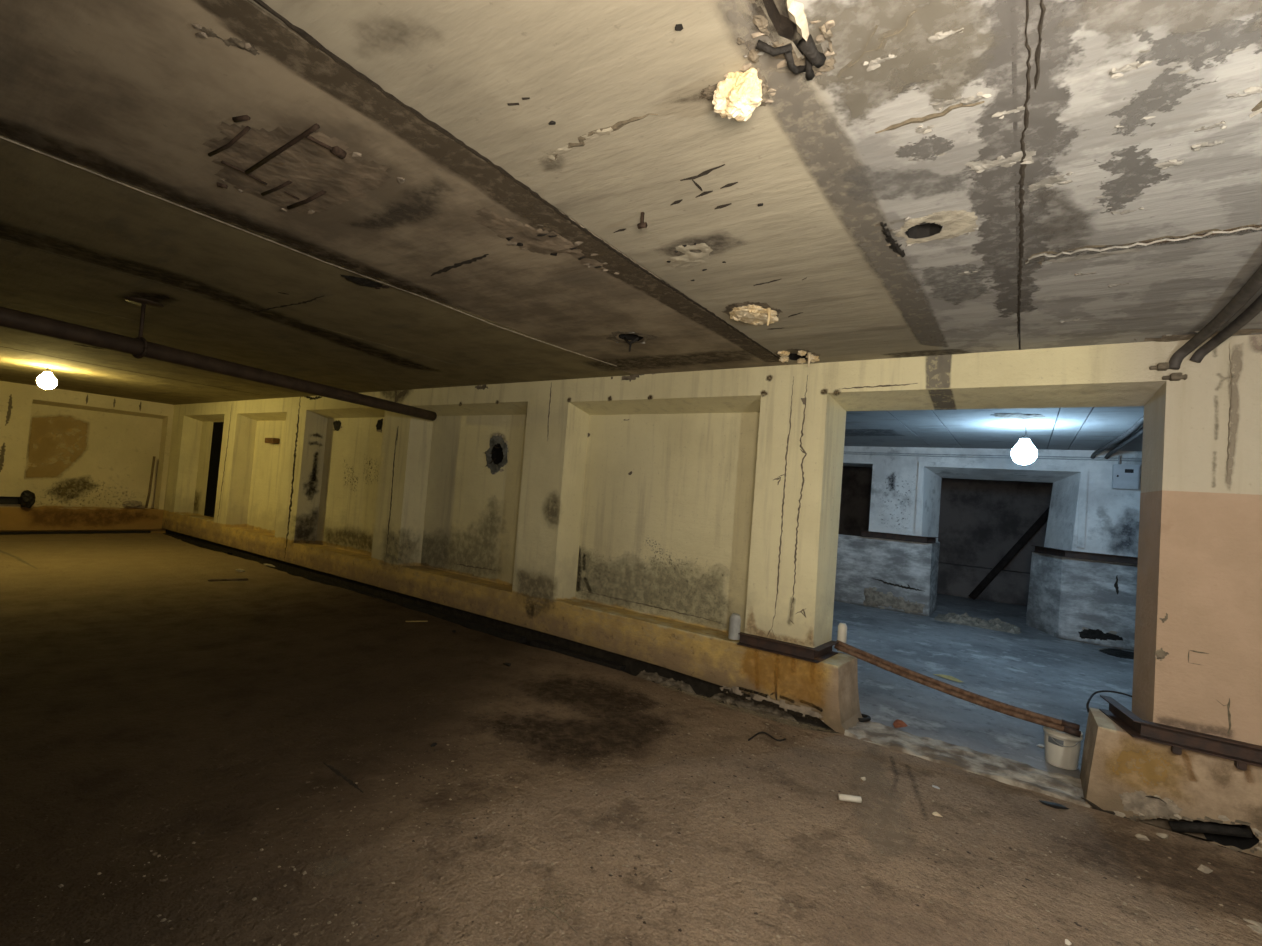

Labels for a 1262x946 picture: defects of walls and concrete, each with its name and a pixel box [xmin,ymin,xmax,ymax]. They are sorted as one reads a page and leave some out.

peeling [896,92,991,161]
peeling [1094,13,1262,215]
spalling [203,115,405,214]
crack [1017,0,1046,338]
spalling [666,239,726,281]
spalling [875,217,912,258]
damp [47,478,127,505]
crack [767,375,808,639]
damp [1112,513,1139,554]
damp [576,547,598,592]
damp [492,678,665,763]
spalling [1114,790,1262,853]